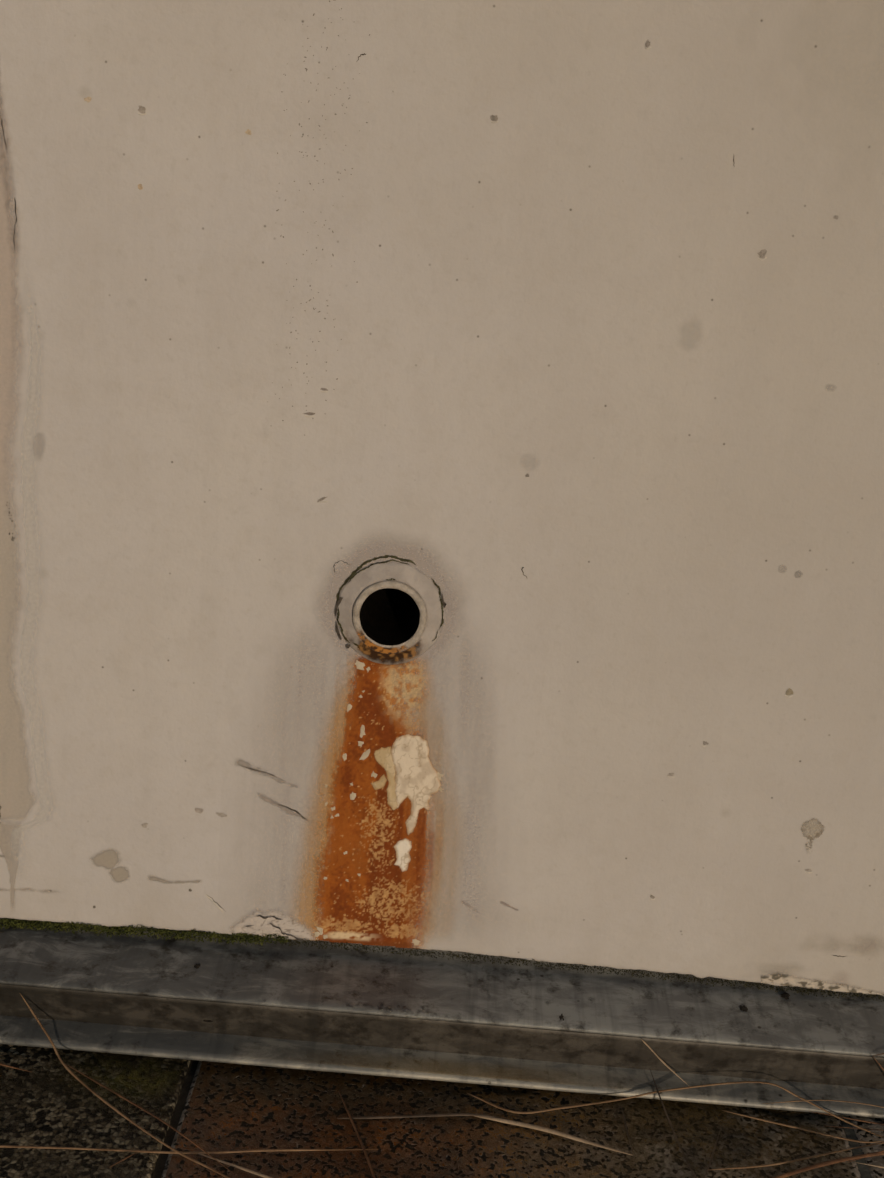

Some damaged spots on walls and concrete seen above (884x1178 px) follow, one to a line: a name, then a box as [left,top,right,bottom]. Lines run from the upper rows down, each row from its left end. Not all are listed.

damp [0,140,51,903]
corrosion [300,632,434,948]